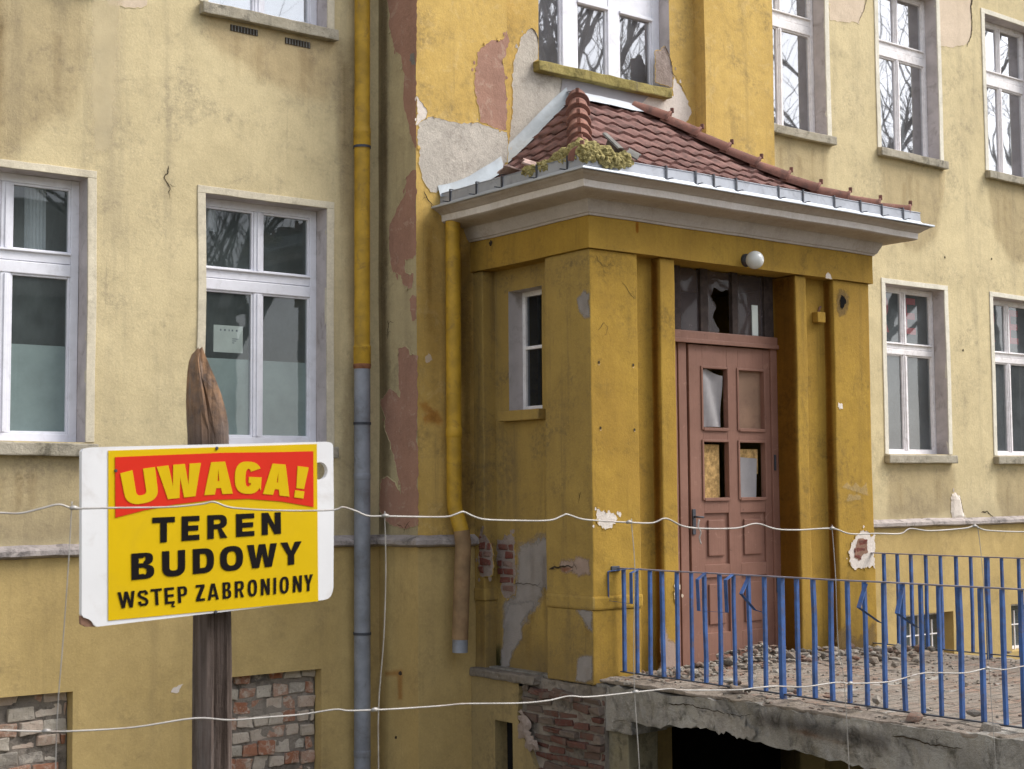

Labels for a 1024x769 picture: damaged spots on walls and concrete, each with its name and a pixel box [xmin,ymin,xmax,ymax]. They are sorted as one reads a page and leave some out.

flaking render [643,46,692,122]
crack [164,166,172,198]
flaking render [387,0,563,322]
peeling [379,346,432,530]
spalling [593,506,621,530]
spalling [848,525,875,571]
flaking render [476,524,547,667]